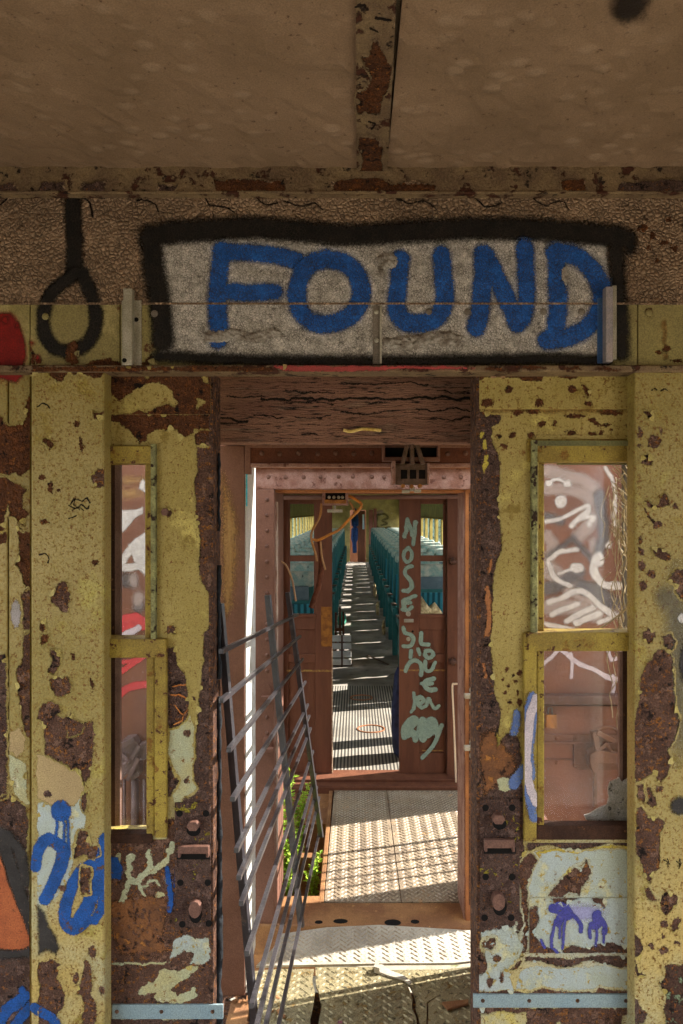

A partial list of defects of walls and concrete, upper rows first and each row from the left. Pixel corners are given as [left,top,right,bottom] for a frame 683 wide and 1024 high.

rust [354,39,394,117]
rust [37,179,109,192]
rust [211,178,288,192]
rust [0,340,273,1024]
rust [479,376,683,1024]
peeling [168,716,197,802]
peeling [8,728,87,905]
peeling [115,841,175,903]
peeling [479,844,627,992]
peeling [112,935,210,1004]